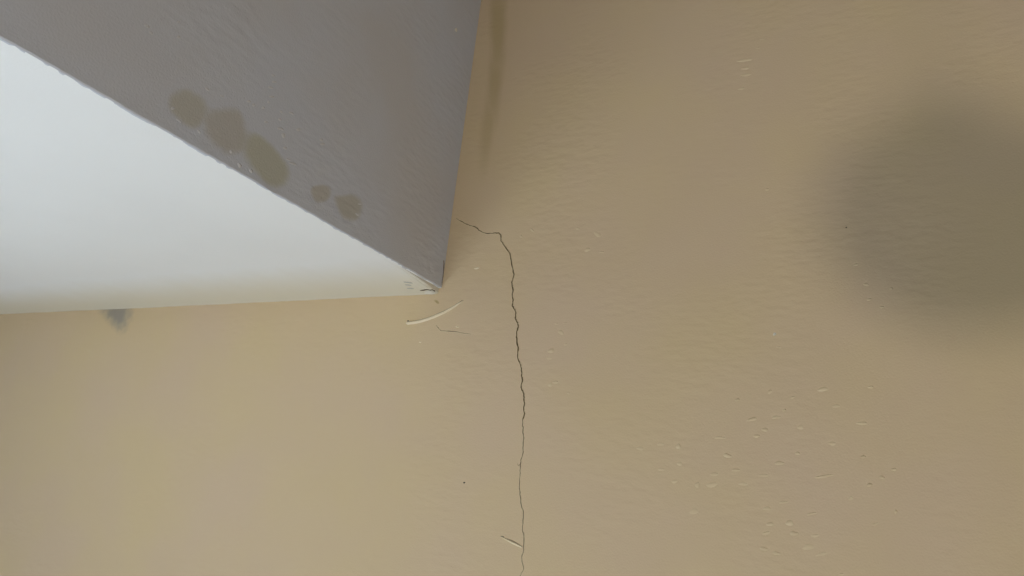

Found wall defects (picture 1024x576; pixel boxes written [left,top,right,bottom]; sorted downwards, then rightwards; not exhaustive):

damp [164,86,295,194]
crack [456,218,526,576]